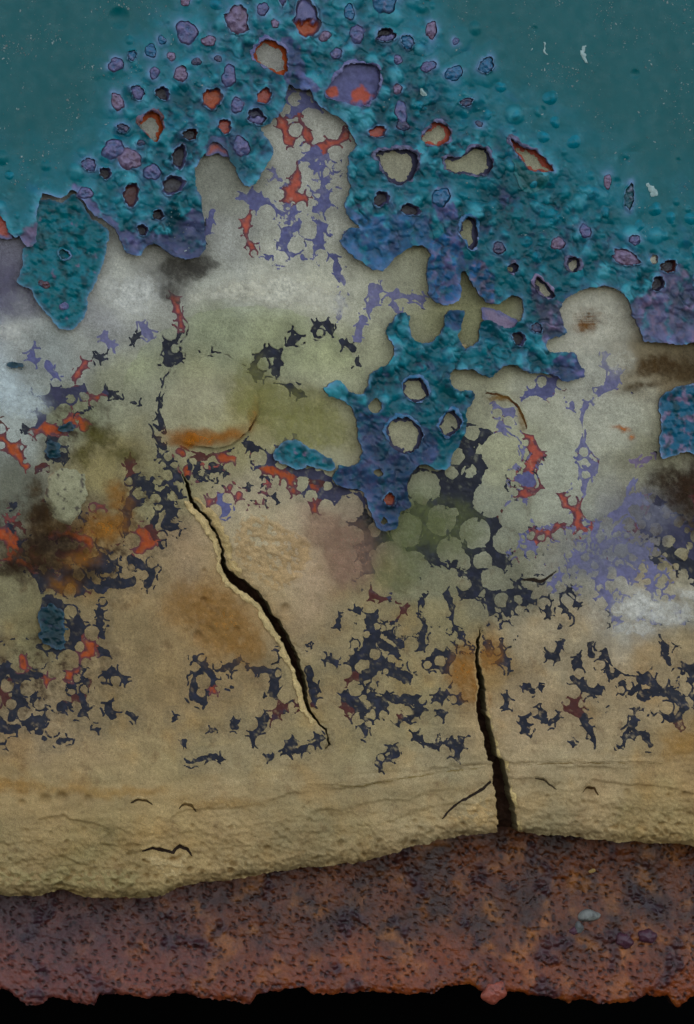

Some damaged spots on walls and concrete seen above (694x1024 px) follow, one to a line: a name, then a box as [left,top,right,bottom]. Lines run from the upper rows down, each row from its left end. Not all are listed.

corrosion [28,485,73,537]
peeling [0,86,694,775]
crack [184,482,323,728]
crack [307,667,664,830]
corrosion [0,826,694,1007]